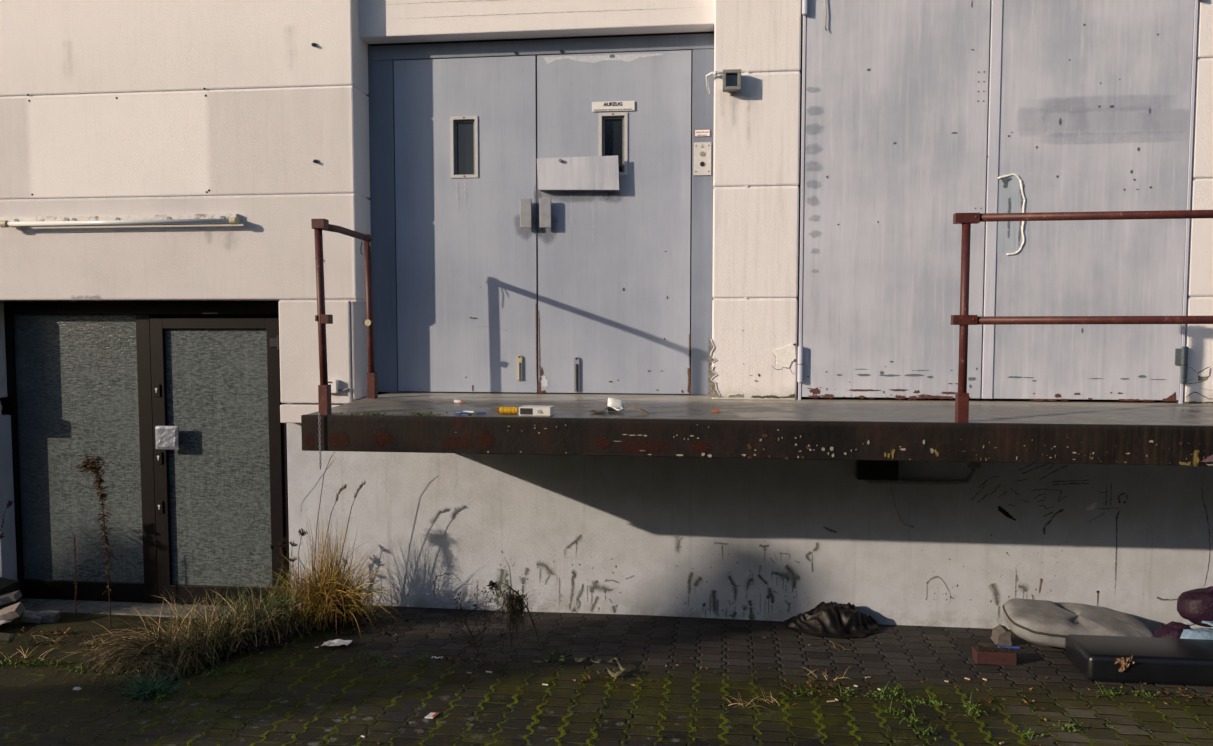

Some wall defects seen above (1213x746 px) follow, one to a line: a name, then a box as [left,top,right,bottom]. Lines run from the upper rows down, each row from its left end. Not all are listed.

peeling [708,338,958,400]
peeling [1110,392,1213,404]
peeling [1146,440,1213,466]